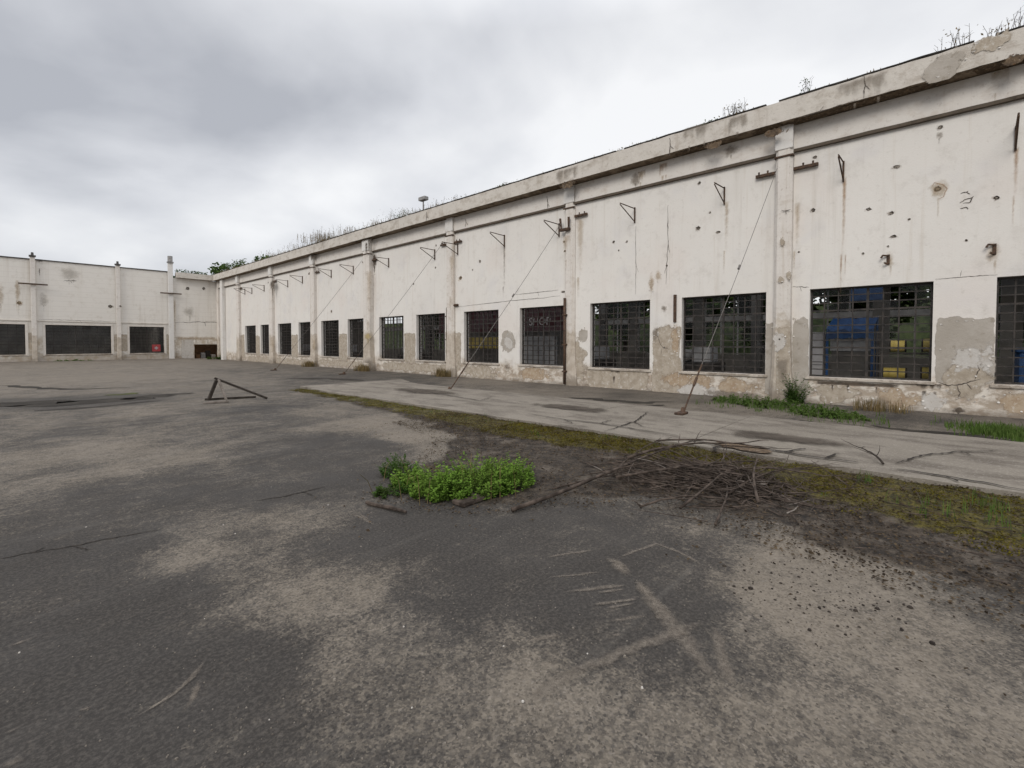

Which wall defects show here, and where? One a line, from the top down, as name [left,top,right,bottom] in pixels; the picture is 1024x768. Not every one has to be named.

peeling [753,28,1024,138]
peeling [576,316,1024,414]